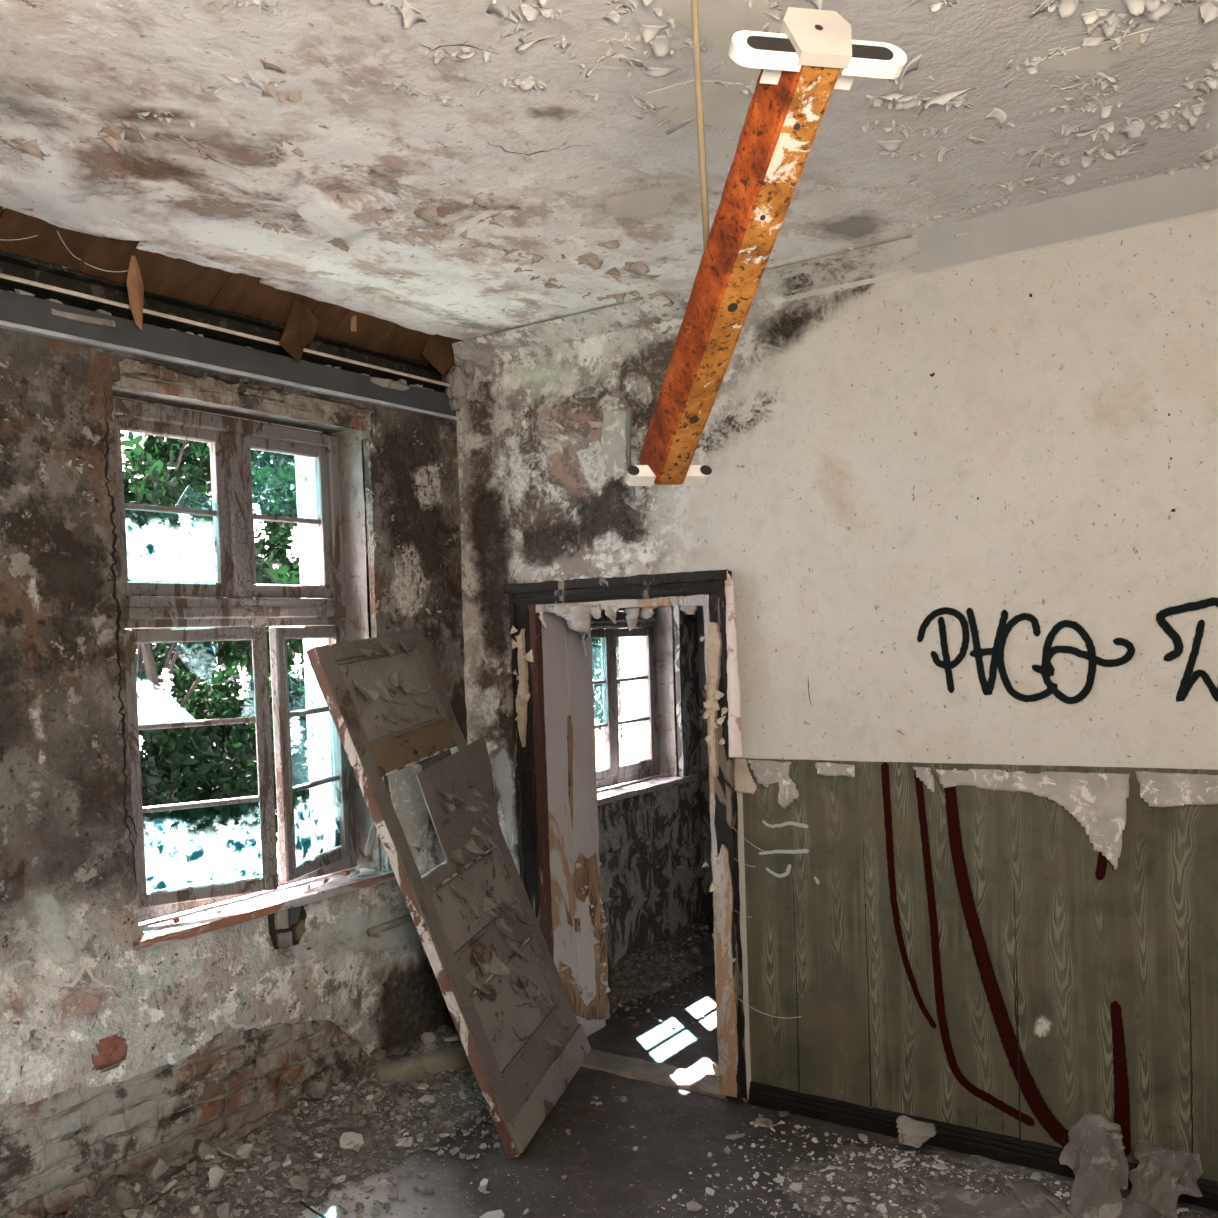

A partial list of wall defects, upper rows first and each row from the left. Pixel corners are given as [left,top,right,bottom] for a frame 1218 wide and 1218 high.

water stain [81,149,303,222]
peeling [403,192,674,307]
peeling [486,0,784,136]
peeling [853,54,986,186]
water stain [389,415,445,616]
crack [102,392,138,884]
water stain [466,338,676,862]
water stain [0,1038,60,1092]
spalling [0,975,440,1218]
water stain [380,959,456,1056]
peeling [557,852,610,1020]
peeling [702,844,738,1097]